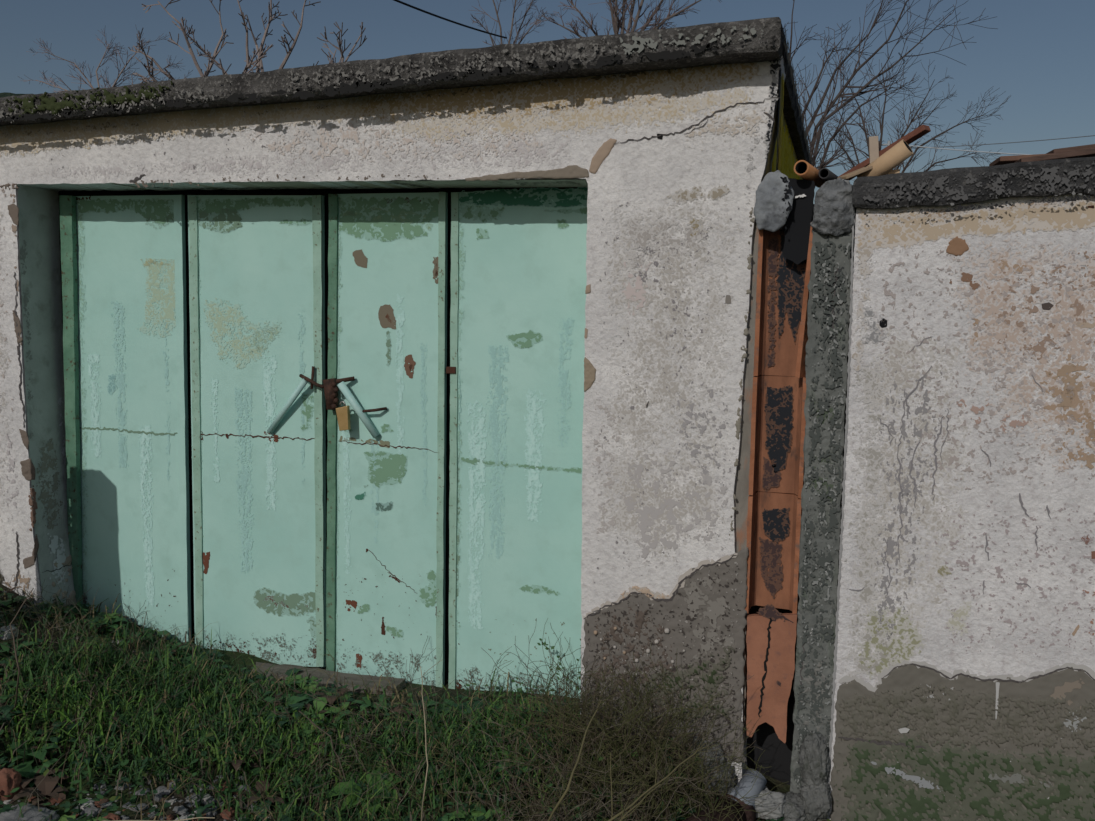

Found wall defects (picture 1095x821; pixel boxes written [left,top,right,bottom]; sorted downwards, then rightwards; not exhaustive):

spalling [465,138,617,181]
crack [615,97,779,144]
peeling [353,249,368,268]
peeling [378,304,396,329]
spalling [5,429,39,602]
crack [849,336,949,595]
spalling [798,236,1095,821]
spalling [580,547,749,763]